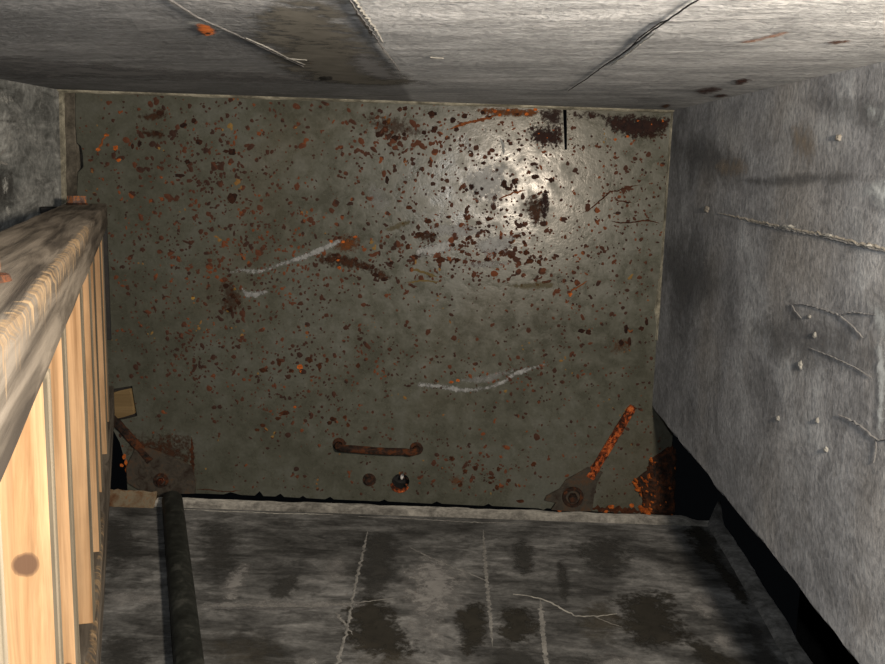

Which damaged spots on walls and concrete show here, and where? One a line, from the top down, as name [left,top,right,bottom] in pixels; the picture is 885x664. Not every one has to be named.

crack [568,0,699,91]
corrosion [697,87,725,98]
corrosion [131,109,164,149]
corrosion [371,111,438,141]
corrosion [450,108,563,148]
corrosion [574,104,670,141]
corrosion [464,169,554,225]
corrosion [319,236,394,281]
corrosion [406,219,438,283]
corrosion [436,235,477,263]
corrosion [484,234,541,264]
corrosion [120,434,195,473]